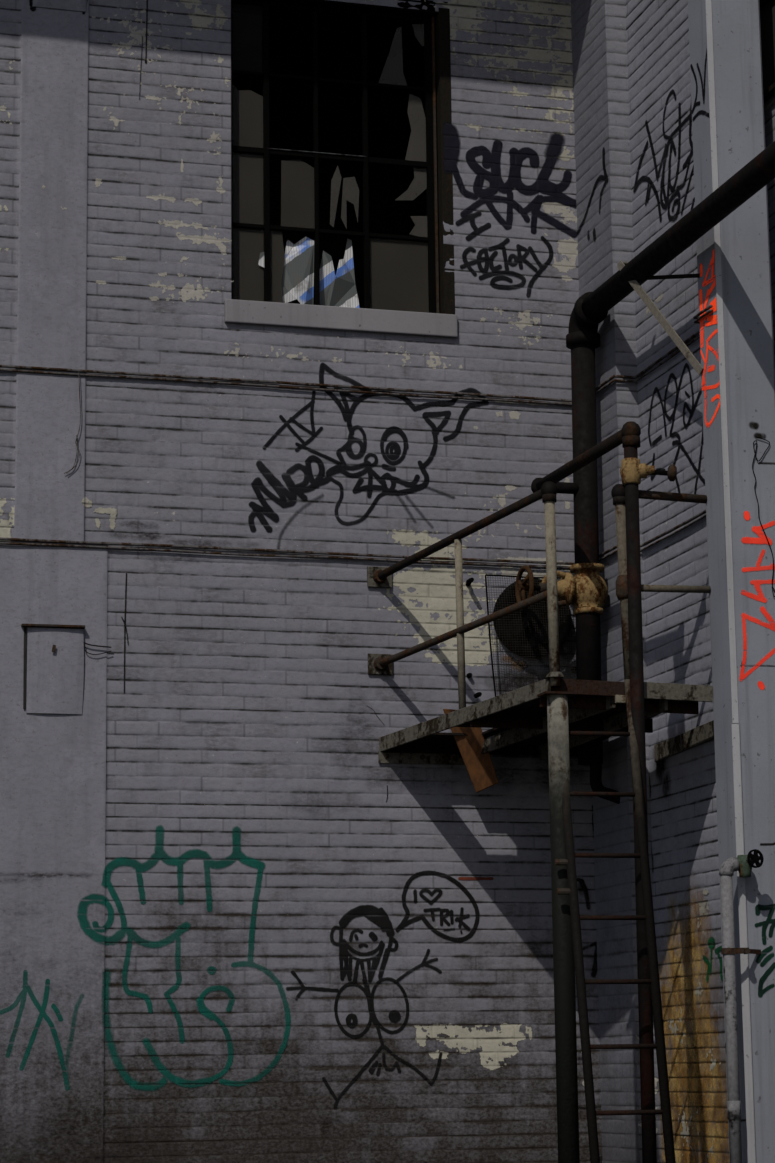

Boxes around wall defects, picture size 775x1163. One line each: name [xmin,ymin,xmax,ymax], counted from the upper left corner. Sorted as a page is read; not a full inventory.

peeling [92,0,228,127]
peeling [149,219,234,312]
peeling [480,300,553,349]
peeling [0,498,15,541]
peeling [378,529,574,666]
peeling [414,1023,532,1070]
rust [662,904,730,1163]